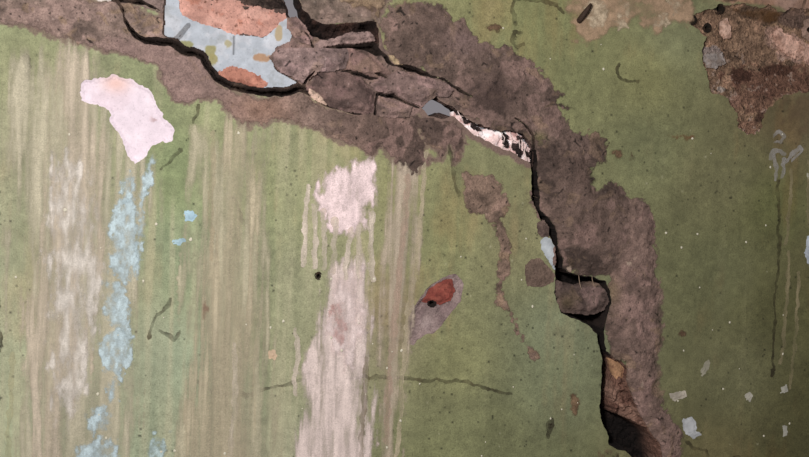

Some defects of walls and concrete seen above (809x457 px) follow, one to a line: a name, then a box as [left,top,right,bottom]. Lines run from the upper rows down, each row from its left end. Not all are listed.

spalling [0,0,534,176]
crack [111,0,470,116]
spalling [565,0,809,135]
leakage [7,42,152,457]
peeling [75,74,175,457]
peeling [184,210,197,222]
leakage [292,160,427,457]
spalling [407,274,464,345]
spalling [462,171,540,361]
spalling [525,237,555,287]
crack [515,118,662,457]
peeling [669,391,687,401]